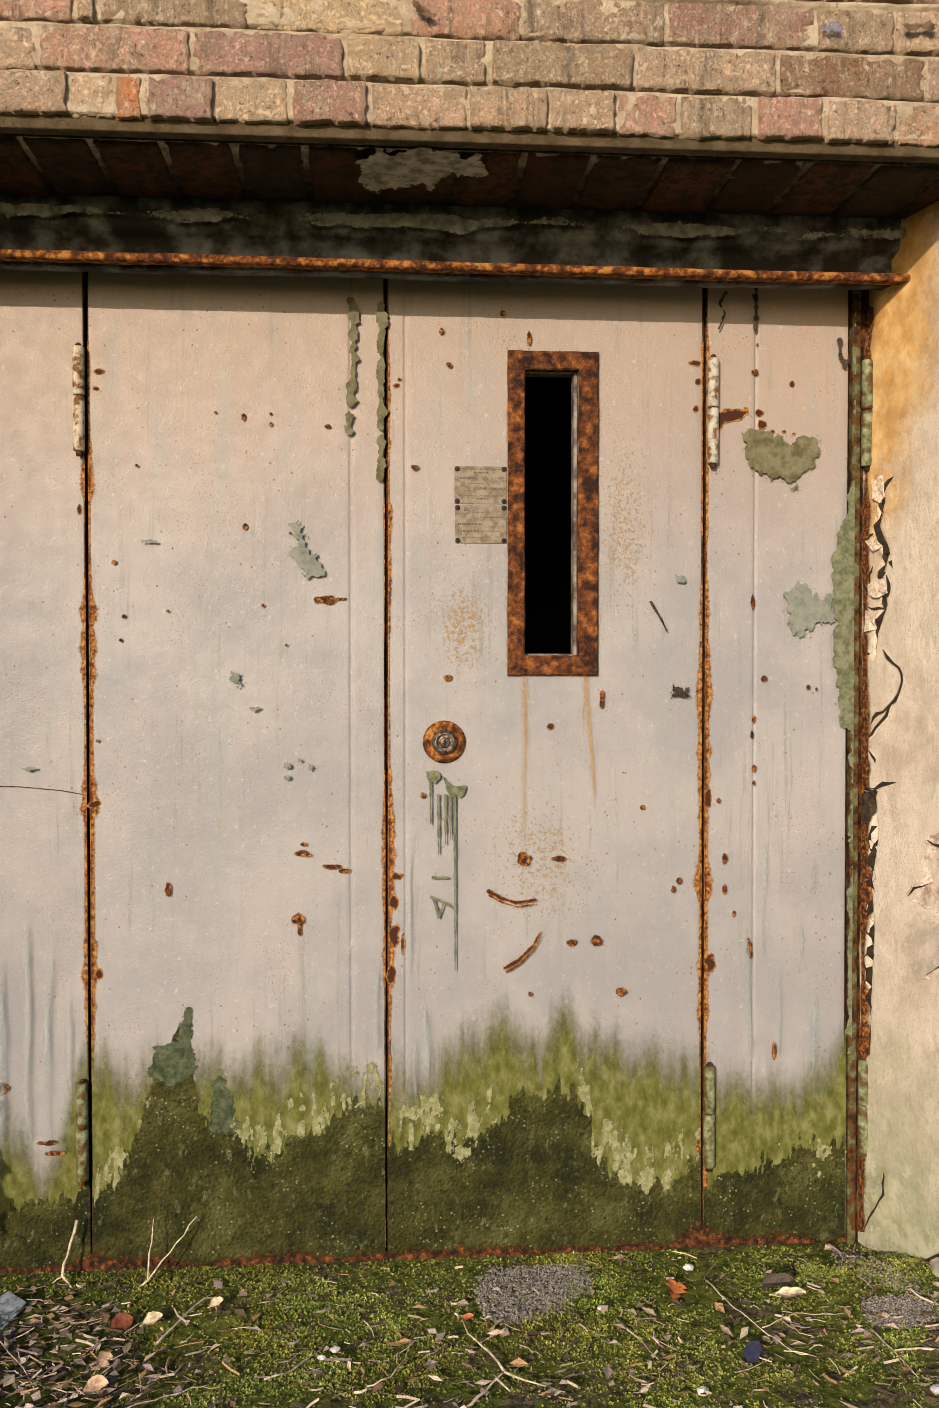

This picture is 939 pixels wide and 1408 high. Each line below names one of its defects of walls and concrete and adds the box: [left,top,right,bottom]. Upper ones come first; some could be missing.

peeling [741,428,821,490]
corrosion [864,306,874,360]
corrosion [77,341,105,1067]
corrosion [381,291,405,1147]
corrosion [476,785,603,952]
corrosion [671,318,795,1187]
peeling [783,480,855,783]
peeling [845,800,853,1054]
corrosion [859,472,875,1059]
crack [860,826,878,1052]
crack [862,475,903,792]
spalling [906,833,939,913]